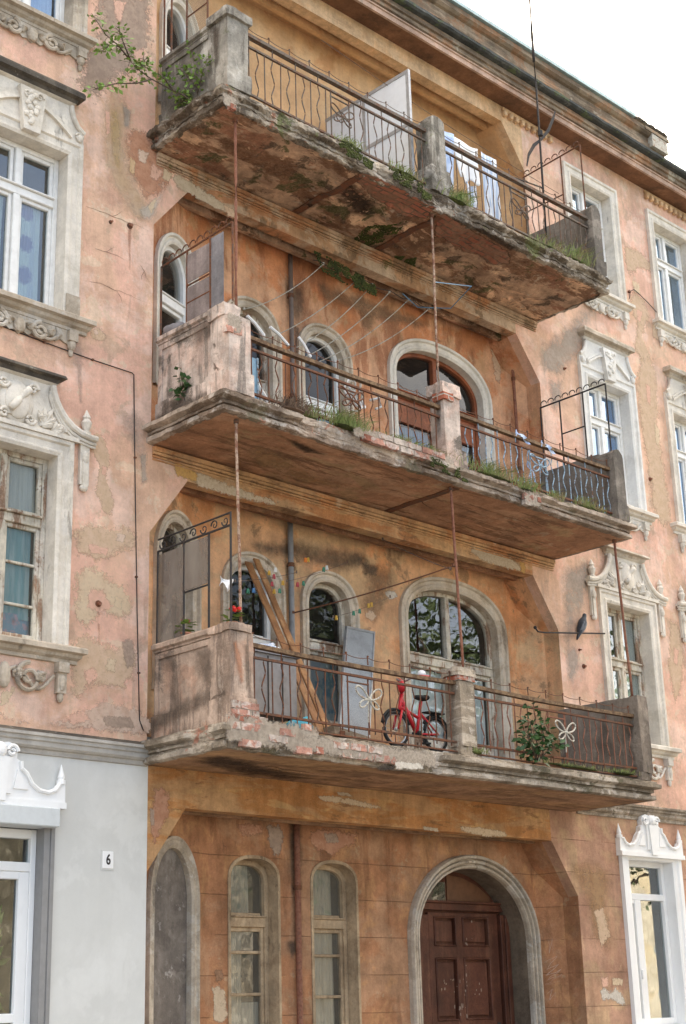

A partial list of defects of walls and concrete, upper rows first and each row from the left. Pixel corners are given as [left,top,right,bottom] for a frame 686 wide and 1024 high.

flaking render [126,131,238,219]
damp [343,185,373,216]
damp [322,286,421,328]
flaking render [353,426,454,465]
peeling [73,566,132,625]
flaking render [226,699,437,771]
damp [206,757,306,779]
peeling [319,792,381,809]
peeling [310,829,356,856]
peeling [575,867,610,946]
peeling [212,969,228,1022]
peeling [601,976,627,1005]